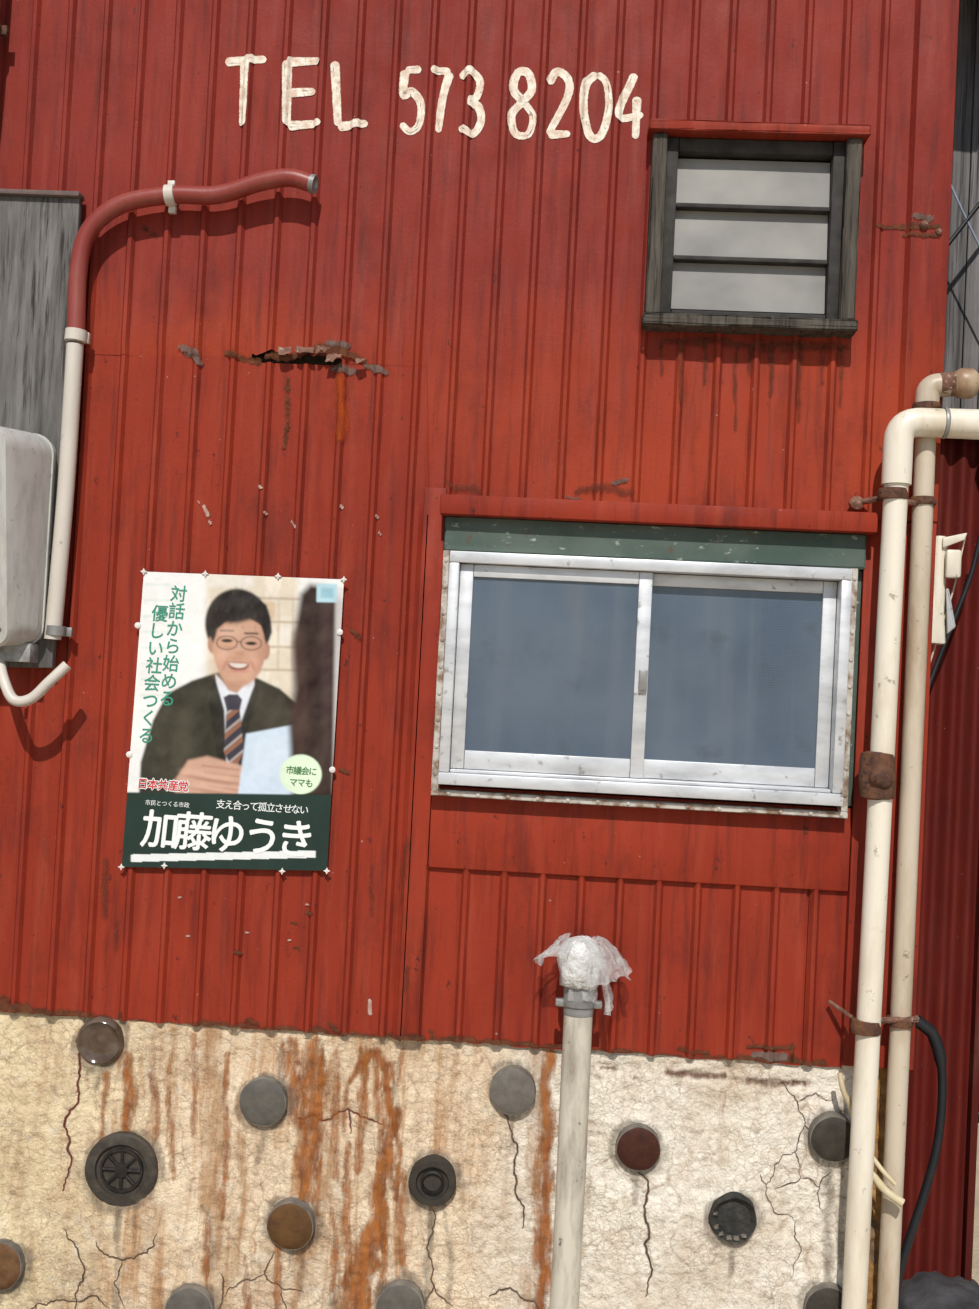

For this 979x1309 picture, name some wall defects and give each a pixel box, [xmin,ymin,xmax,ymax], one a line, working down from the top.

peeling [278,345,389,375]
crack [62,1029,81,1191]
crack [31,1228,157,1309]
corrosion [103,1054,173,1152]
corrosion [171,1018,562,1309]
crack [504,1114,525,1228]
crack [638,1172,654,1297]
corrosion [591,1043,827,1066]
crack [760,1083,831,1279]